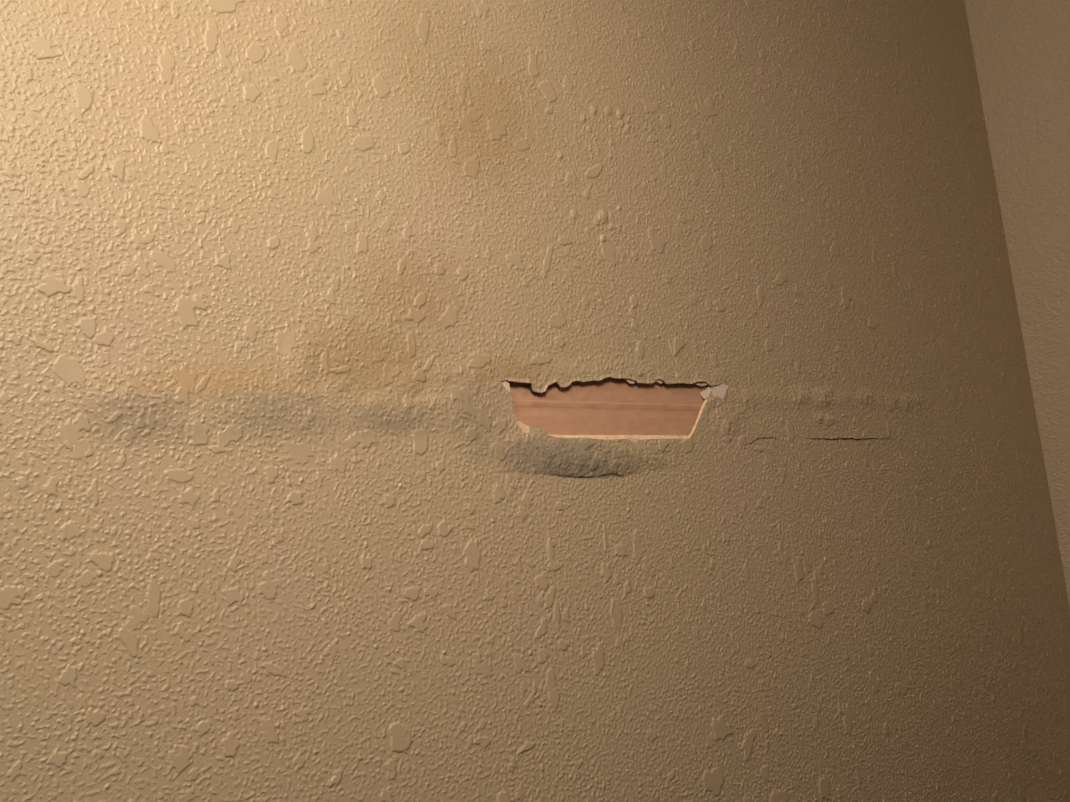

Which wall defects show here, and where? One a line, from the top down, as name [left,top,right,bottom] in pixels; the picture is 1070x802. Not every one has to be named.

spalling [501,373,728,443]
crack [806,434,889,442]